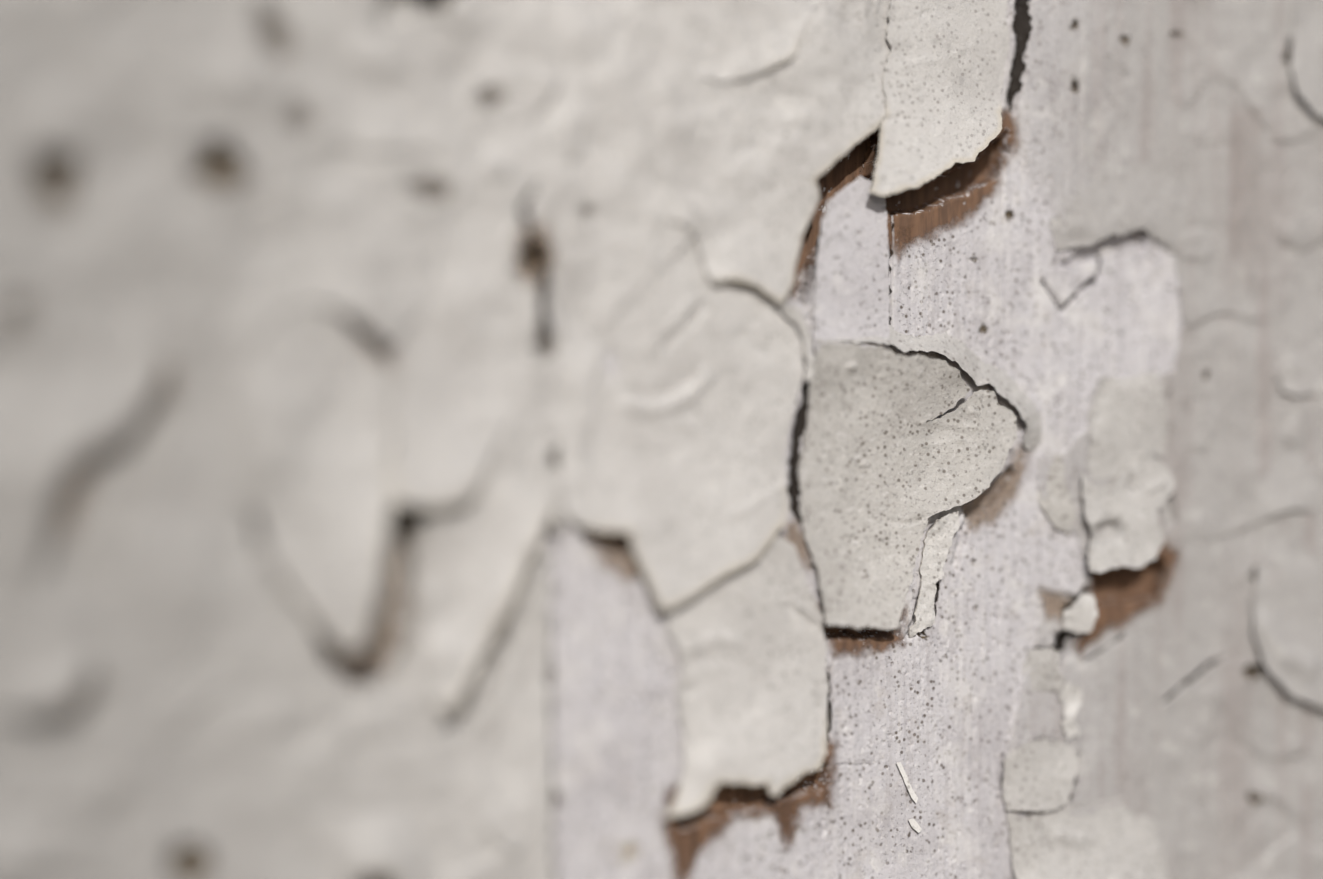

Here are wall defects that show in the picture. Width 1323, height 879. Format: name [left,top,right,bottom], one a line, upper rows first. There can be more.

crack [887,222,895,325]
peeling [1050,161,1187,251]
peeling [206,0,1018,819]
peeling [1081,371,1175,573]
peeling [1062,593,1098,634]
peeling [1002,647,1168,879]